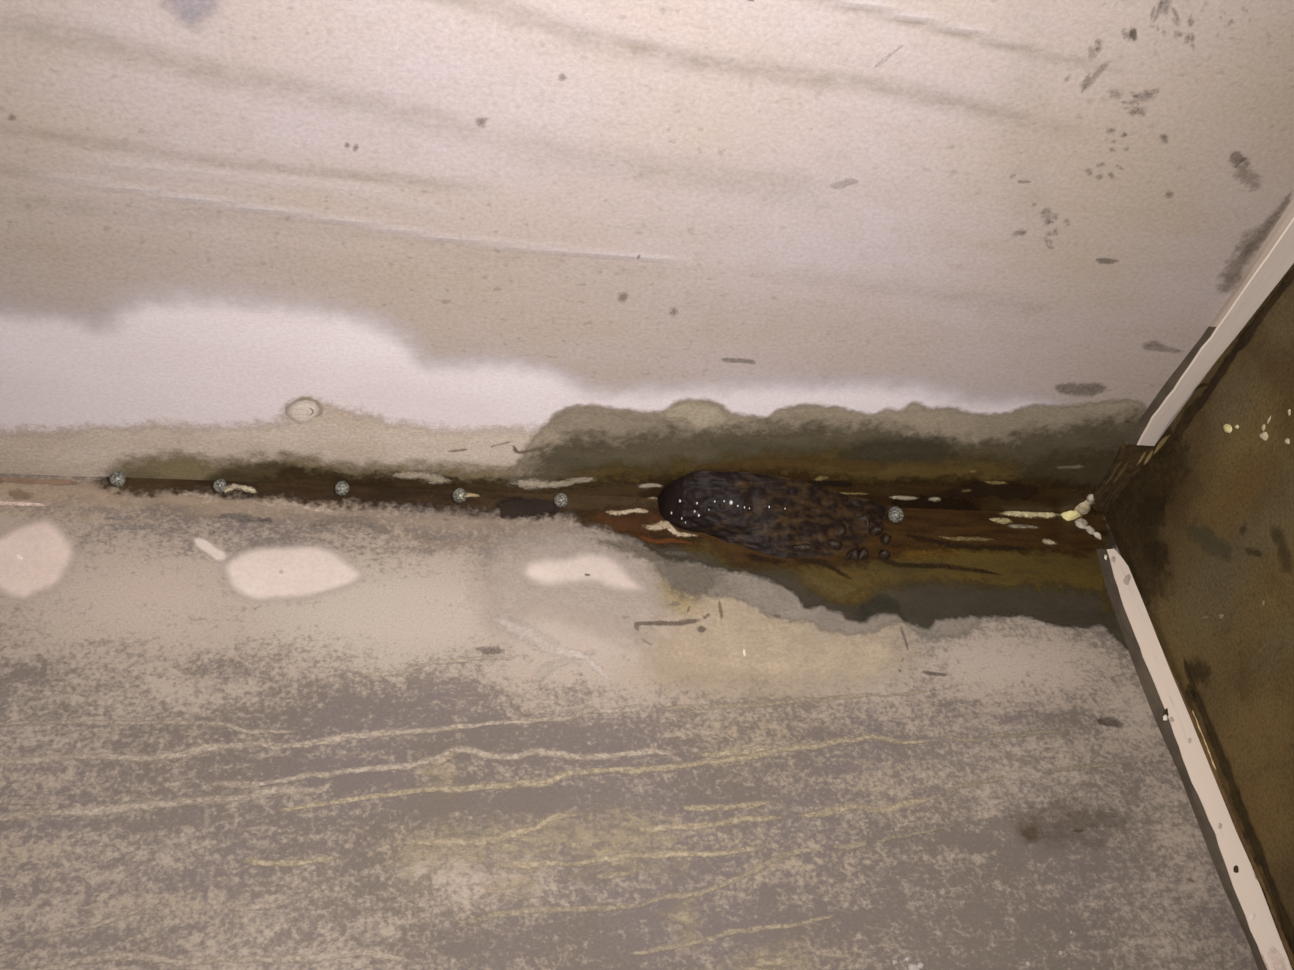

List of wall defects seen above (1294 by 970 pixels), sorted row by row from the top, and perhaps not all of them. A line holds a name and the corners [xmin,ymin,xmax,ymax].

damp [0,270,1294,649]
corrosion [574,457,1109,576]
crack [0,628,1067,924]
damp [1184,659,1294,970]